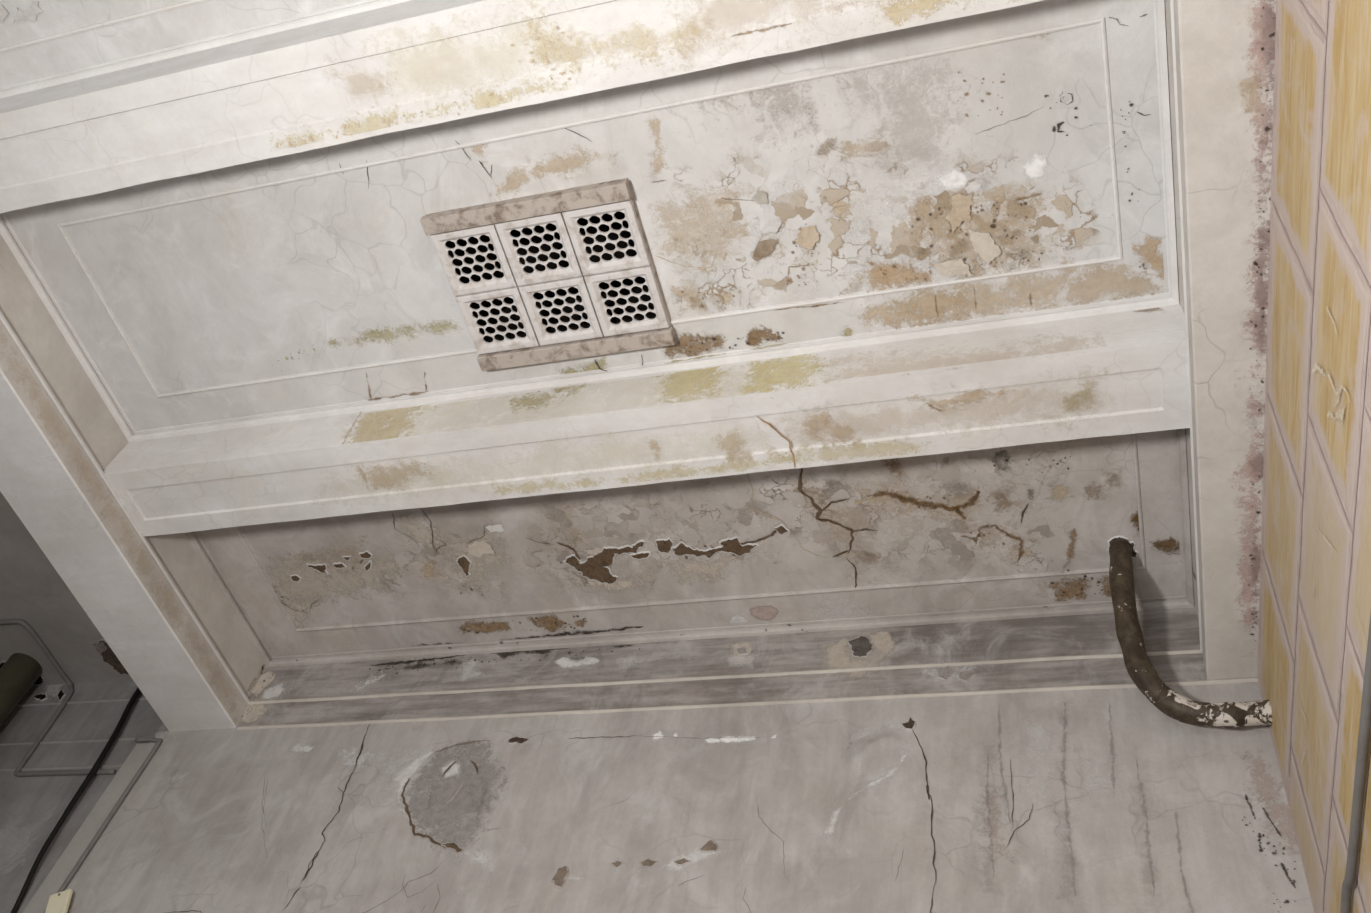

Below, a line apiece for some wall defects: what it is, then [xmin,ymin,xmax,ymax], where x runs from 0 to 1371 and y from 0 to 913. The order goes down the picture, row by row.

damp [276,26,570,148]
peeling [657,157,925,307]
peeling [938,169,967,190]
damp [342,373,428,444]
damp [510,359,606,412]
damp [659,330,817,402]
damp [1233,0,1276,642]
flaking render [525,524,790,591]
flaking render [92,639,130,676]
crack [284,719,372,909]
flaking render [379,740,506,863]
crack [901,717,936,913]